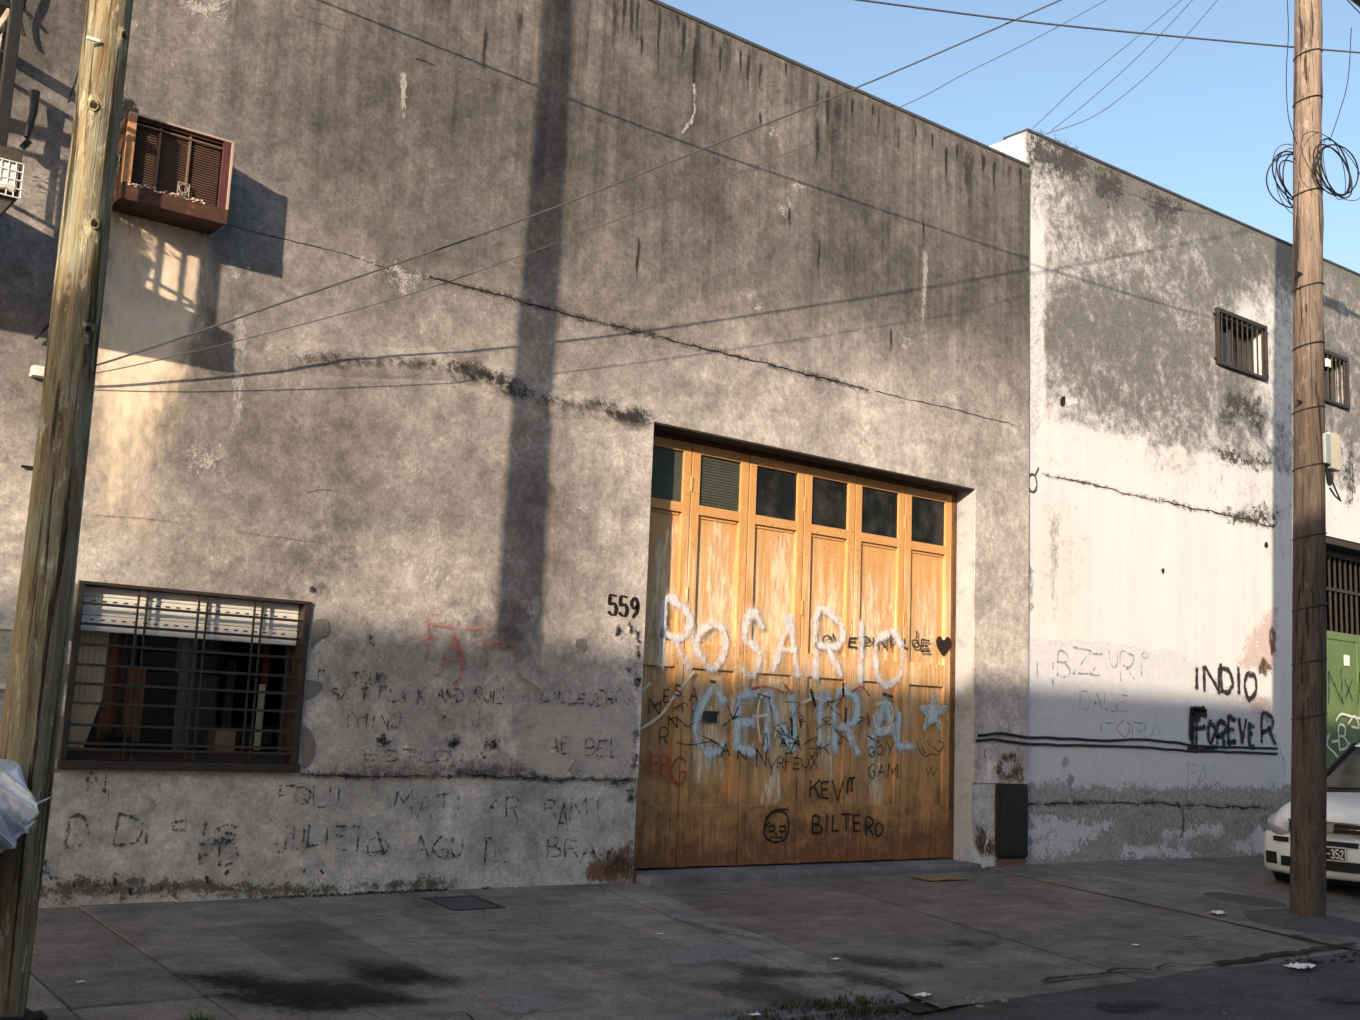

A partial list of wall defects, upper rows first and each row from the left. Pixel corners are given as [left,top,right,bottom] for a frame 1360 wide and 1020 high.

damp [613,0,762,133]
damp [816,84,854,158]
damp [915,126,995,201]
damp [1019,131,1127,208]
damp [1143,188,1183,228]
damp [94,211,205,504]
crack [227,225,1016,426]
damp [1218,392,1272,473]
crack [1042,473,1275,529]
damp [1331,442,1356,504]
flaking render [1027,757,1291,864]
corrosion [585,840,634,883]